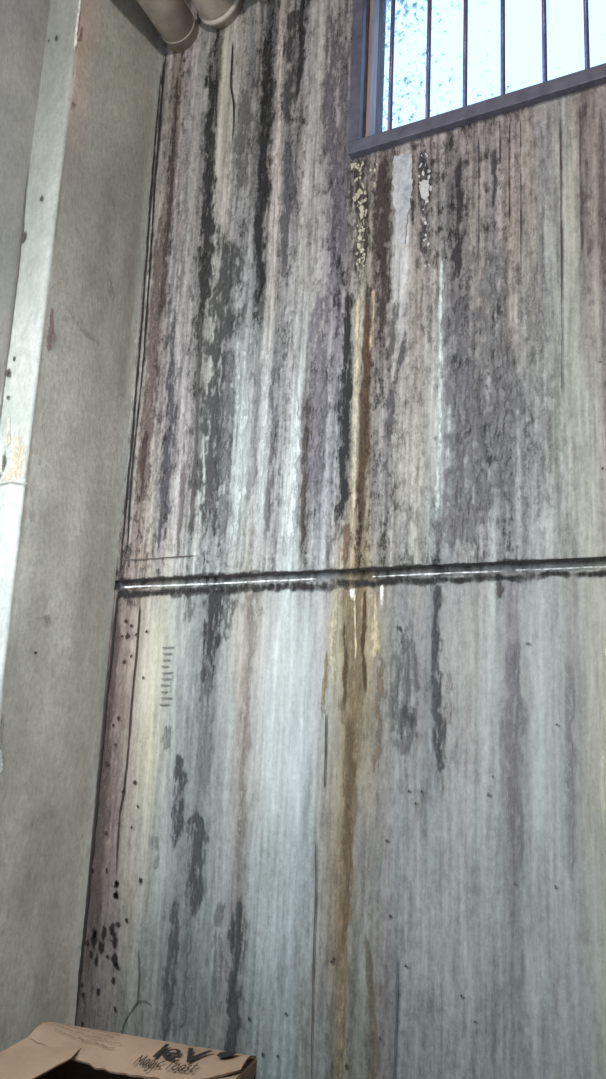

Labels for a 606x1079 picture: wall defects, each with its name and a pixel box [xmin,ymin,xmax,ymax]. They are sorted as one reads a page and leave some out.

water stain [135,63,276,556]
water stain [231,0,305,305]
water stain [286,293,356,542]
rust [342,290,376,564]
peeling [351,161,378,277]
water stain [323,23,407,446]
peeling [392,152,432,246]
water stain [411,151,432,256]
water stain [430,120,562,547]
water stain [85,556,606,1051]
rust [321,587,383,1079]